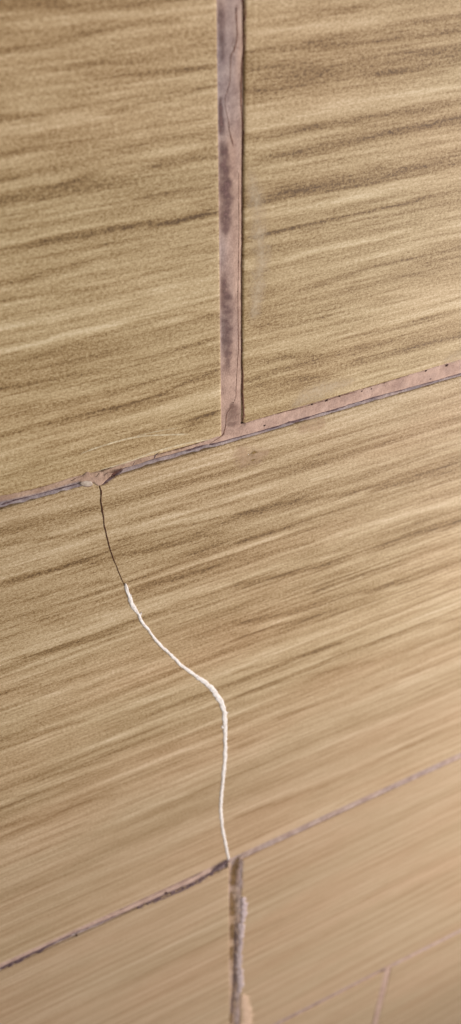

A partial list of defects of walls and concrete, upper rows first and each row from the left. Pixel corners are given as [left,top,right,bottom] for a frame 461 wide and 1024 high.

crack [0,303,461,969]